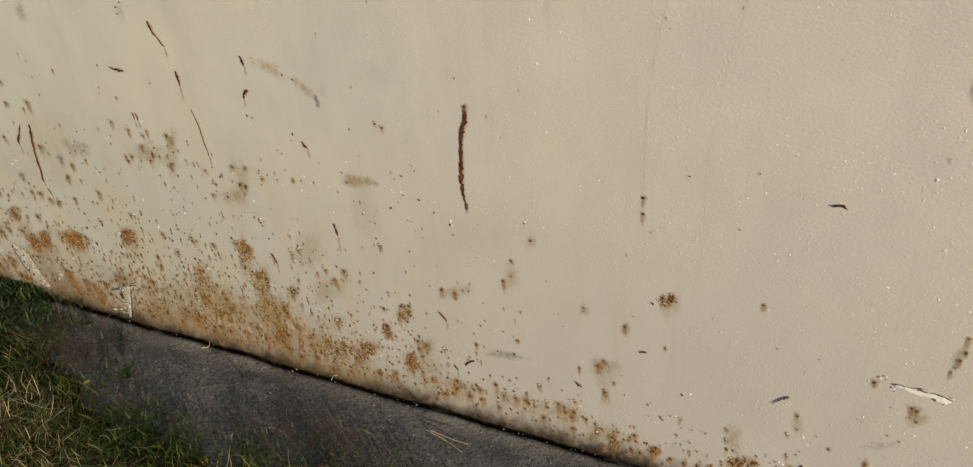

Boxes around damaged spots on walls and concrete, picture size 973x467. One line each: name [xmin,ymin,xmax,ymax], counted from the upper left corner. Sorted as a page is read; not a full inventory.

rust [459,105,468,211]
rust [0,125,776,467]
peeling [880,377,955,405]